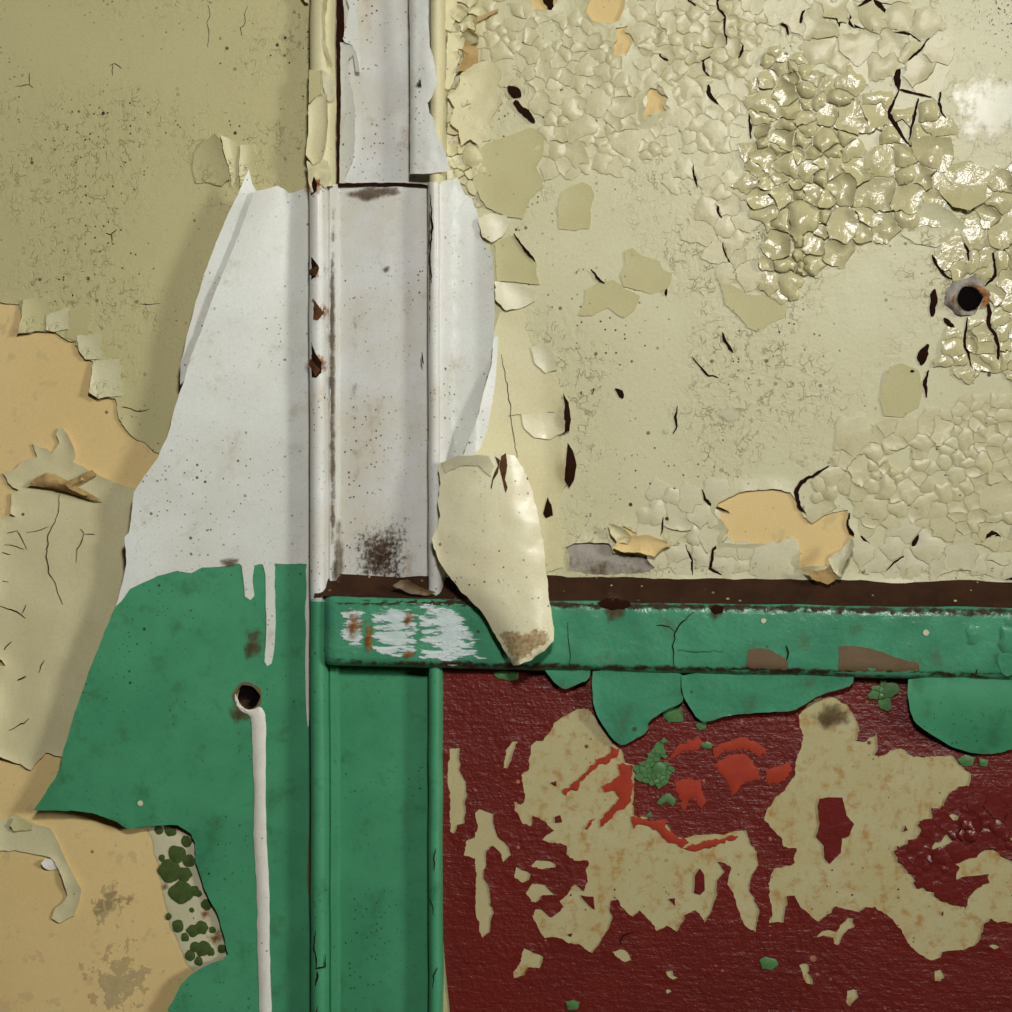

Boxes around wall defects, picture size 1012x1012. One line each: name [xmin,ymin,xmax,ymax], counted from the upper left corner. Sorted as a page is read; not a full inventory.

crack [507,86,535,123]
crack [688,0,744,105]
crack [836,0,946,147]
peeling [409,0,1012,666]
crack [910,344,929,398]
crack [929,243,1000,366]
rust [968,283,990,306]
peeling [0,0,360,1012]
crack [794,465,829,513]
peeling [447,748,511,937]
peeling [504,741,518,768]
peeling [513,615,1012,984]